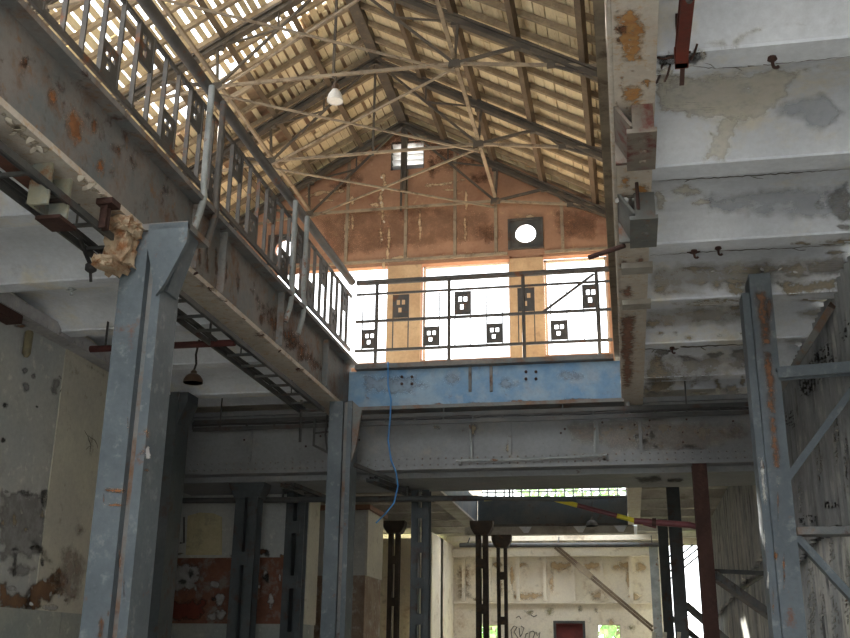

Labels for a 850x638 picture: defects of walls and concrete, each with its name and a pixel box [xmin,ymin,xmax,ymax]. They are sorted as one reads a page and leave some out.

corrosion [614,10,645,61]
corrosion [620,77,650,105]
spalling [656,55,675,84]
spalling [688,44,706,65]
corrosion [255,297,321,371]
corrosion [619,316,636,387]
corrosion [756,292,779,468]
flaking render [0,567,75,610]
spalling [173,553,226,621]